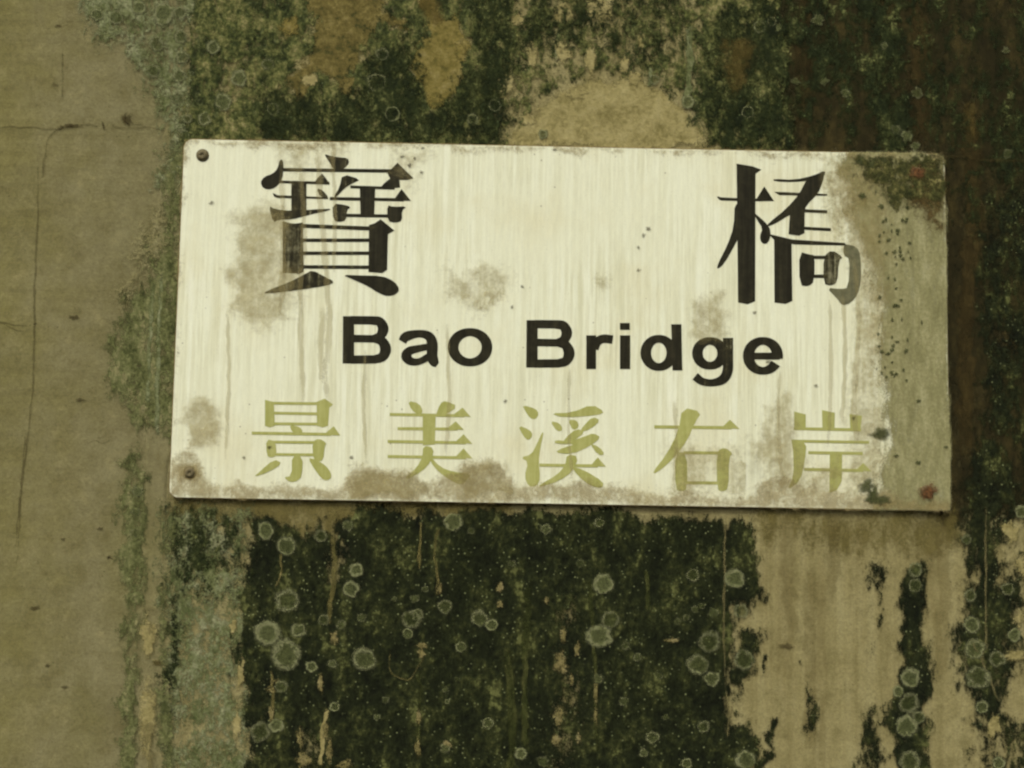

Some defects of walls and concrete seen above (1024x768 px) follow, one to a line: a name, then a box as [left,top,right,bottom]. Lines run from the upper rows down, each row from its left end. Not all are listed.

leakage [683,26,695,96]
leakage [758,0,1024,555]
leakage [172,498,512,624]
leakage [318,710,329,765]
leakage [504,586,532,768]